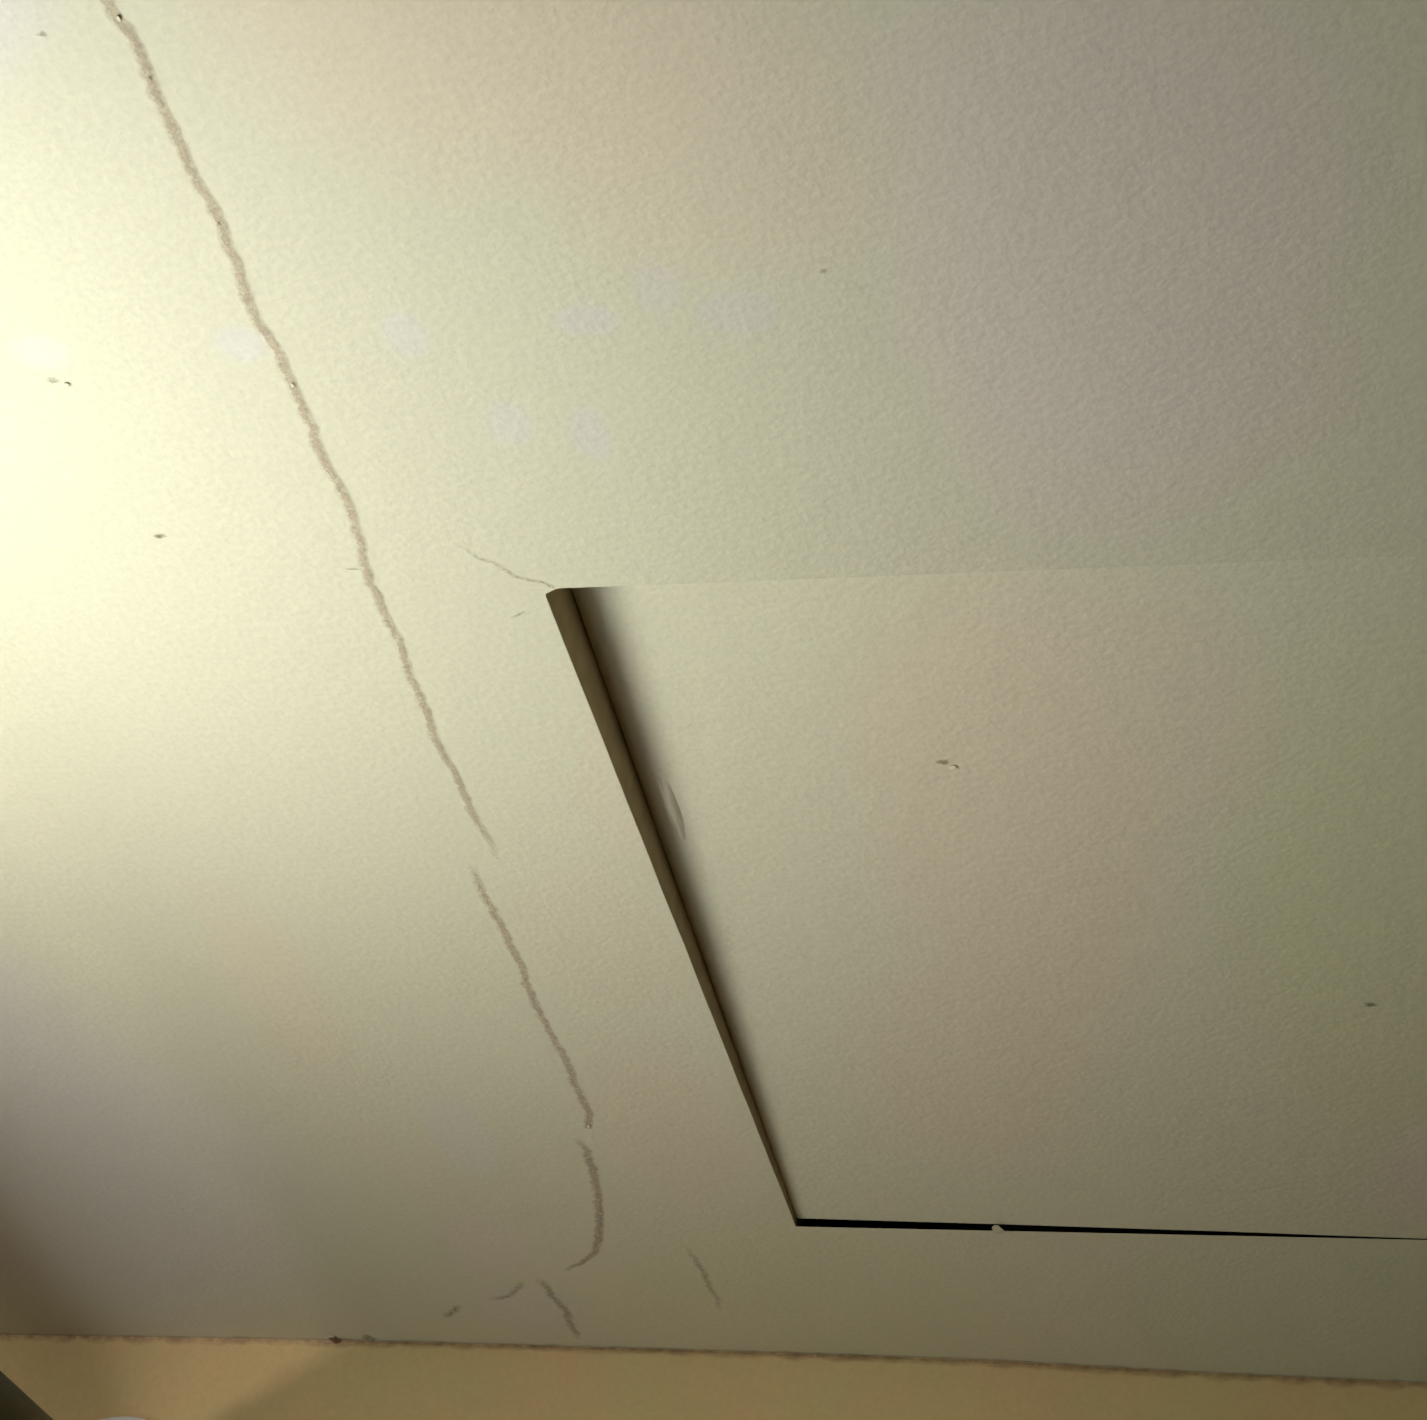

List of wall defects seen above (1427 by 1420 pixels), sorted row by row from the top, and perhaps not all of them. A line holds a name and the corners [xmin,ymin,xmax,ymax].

crack [102,0,477,821]
crack [478,886,602,1266]
crack [500,1287,706,1352]
crack [772,1352,897,1360]